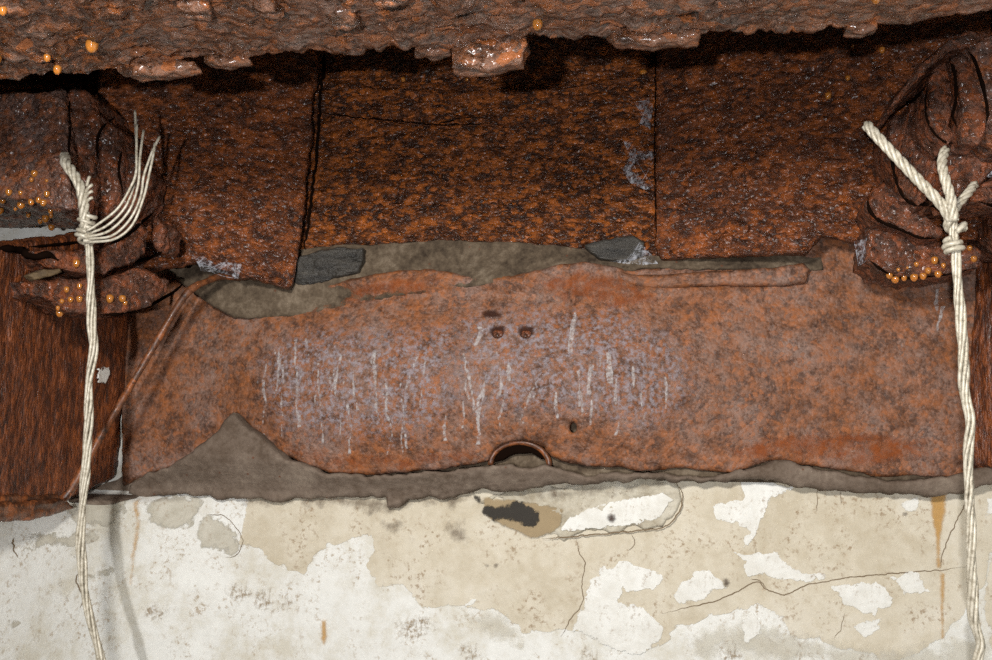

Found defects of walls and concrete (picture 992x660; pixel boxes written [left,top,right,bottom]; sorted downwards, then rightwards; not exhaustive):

corrosion [117,51,253,83]
corrosion [177,0,213,22]
corrosion [252,0,284,21]
corrosion [326,7,362,31]
corrosion [414,36,531,78]
corrosion [605,29,701,52]
corrosion [843,20,878,38]
peeling [0,498,127,551]
corrosion [932,495,945,544]
peeling [144,478,992,660]
crack [547,485,683,633]
crack [667,505,964,613]